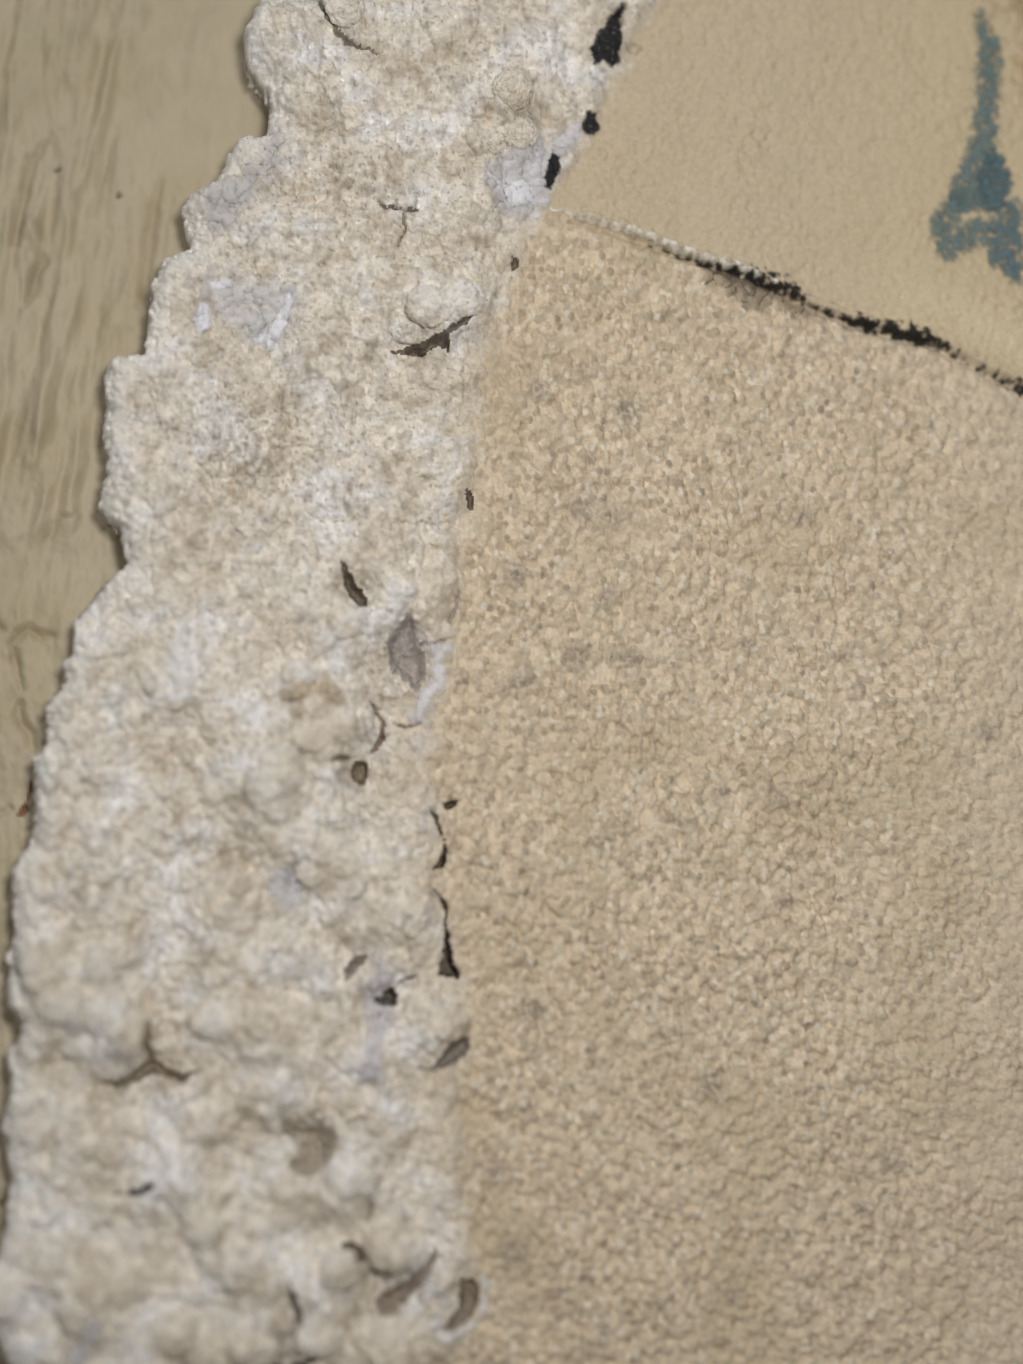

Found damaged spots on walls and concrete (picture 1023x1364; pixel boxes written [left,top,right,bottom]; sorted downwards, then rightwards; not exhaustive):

crack [317,0,377,55]
crack [379,201,419,247]
crack [431,800,460,980]
crack [113,1184,154,1197]